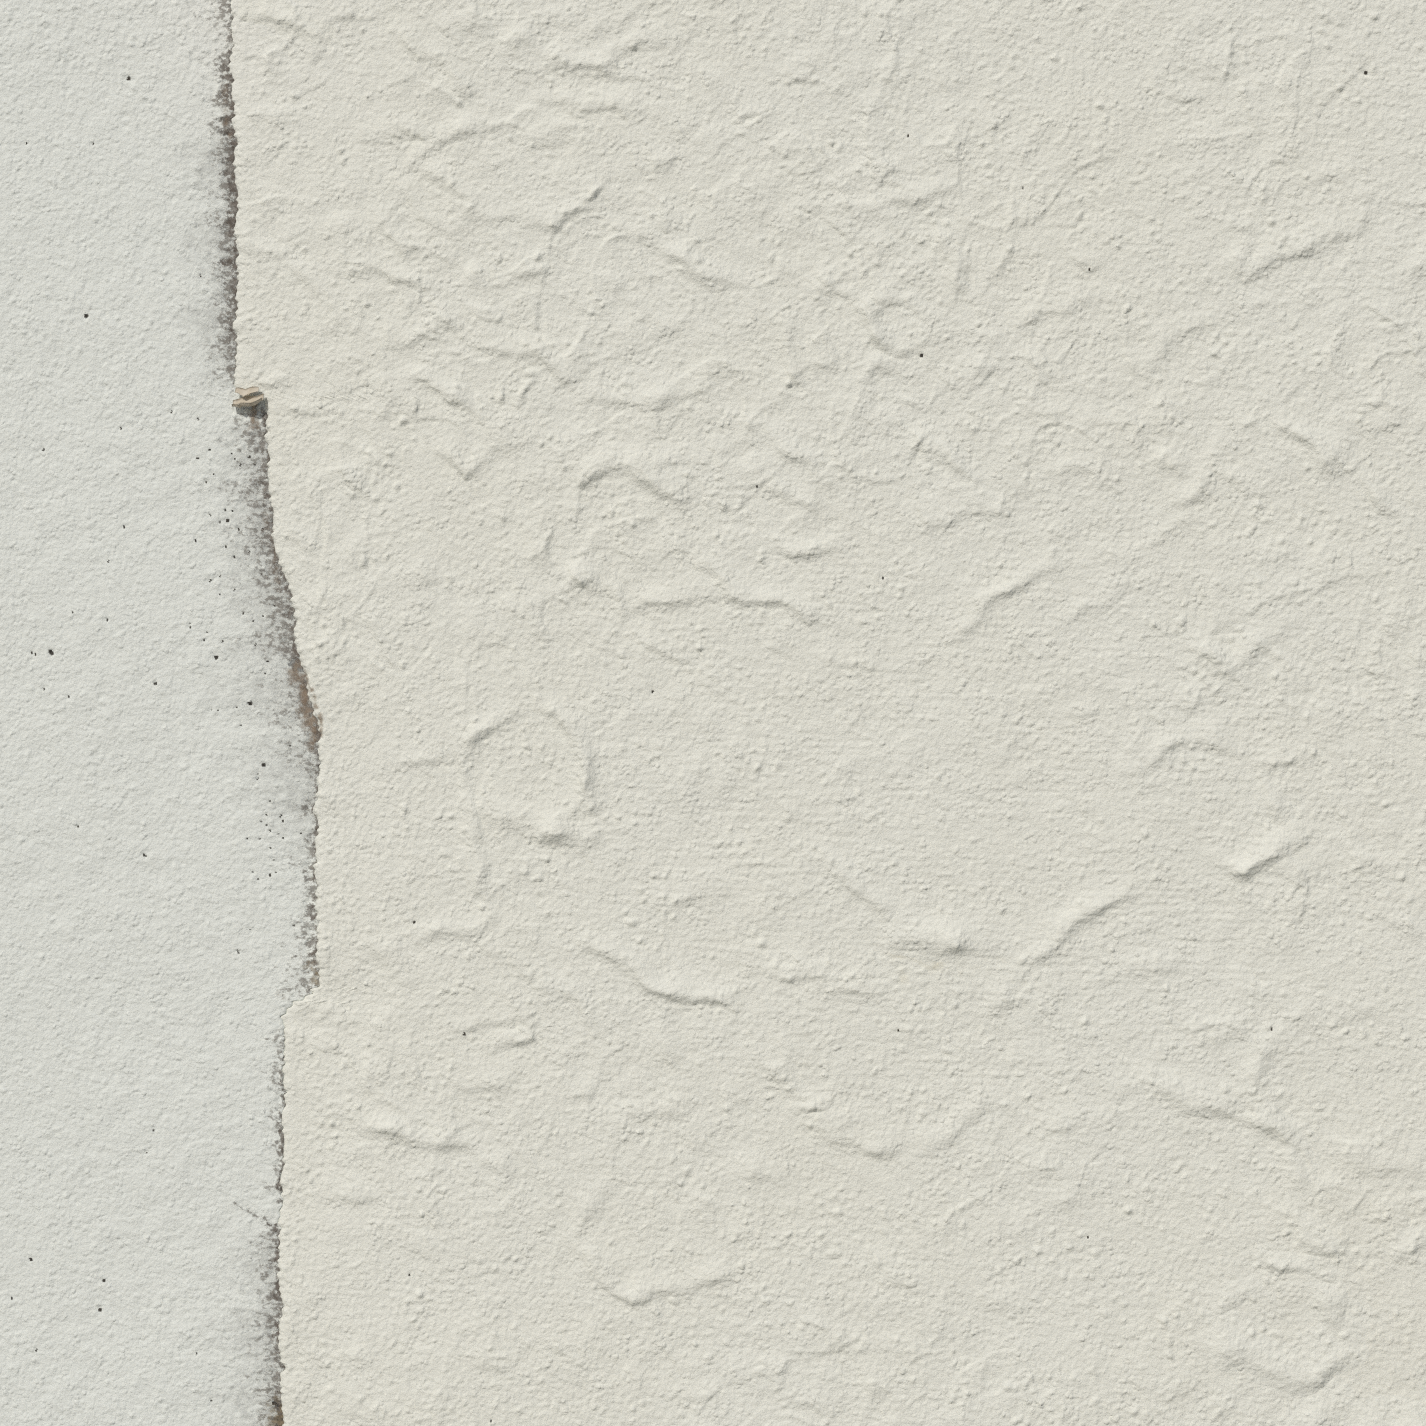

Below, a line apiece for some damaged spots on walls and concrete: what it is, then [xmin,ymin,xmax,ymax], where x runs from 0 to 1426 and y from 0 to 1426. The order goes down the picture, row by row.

crack [218,49,239,331]
peeling [232,386,264,408]
crack [277,559,321,962]
crack [234,1072,286,1410]